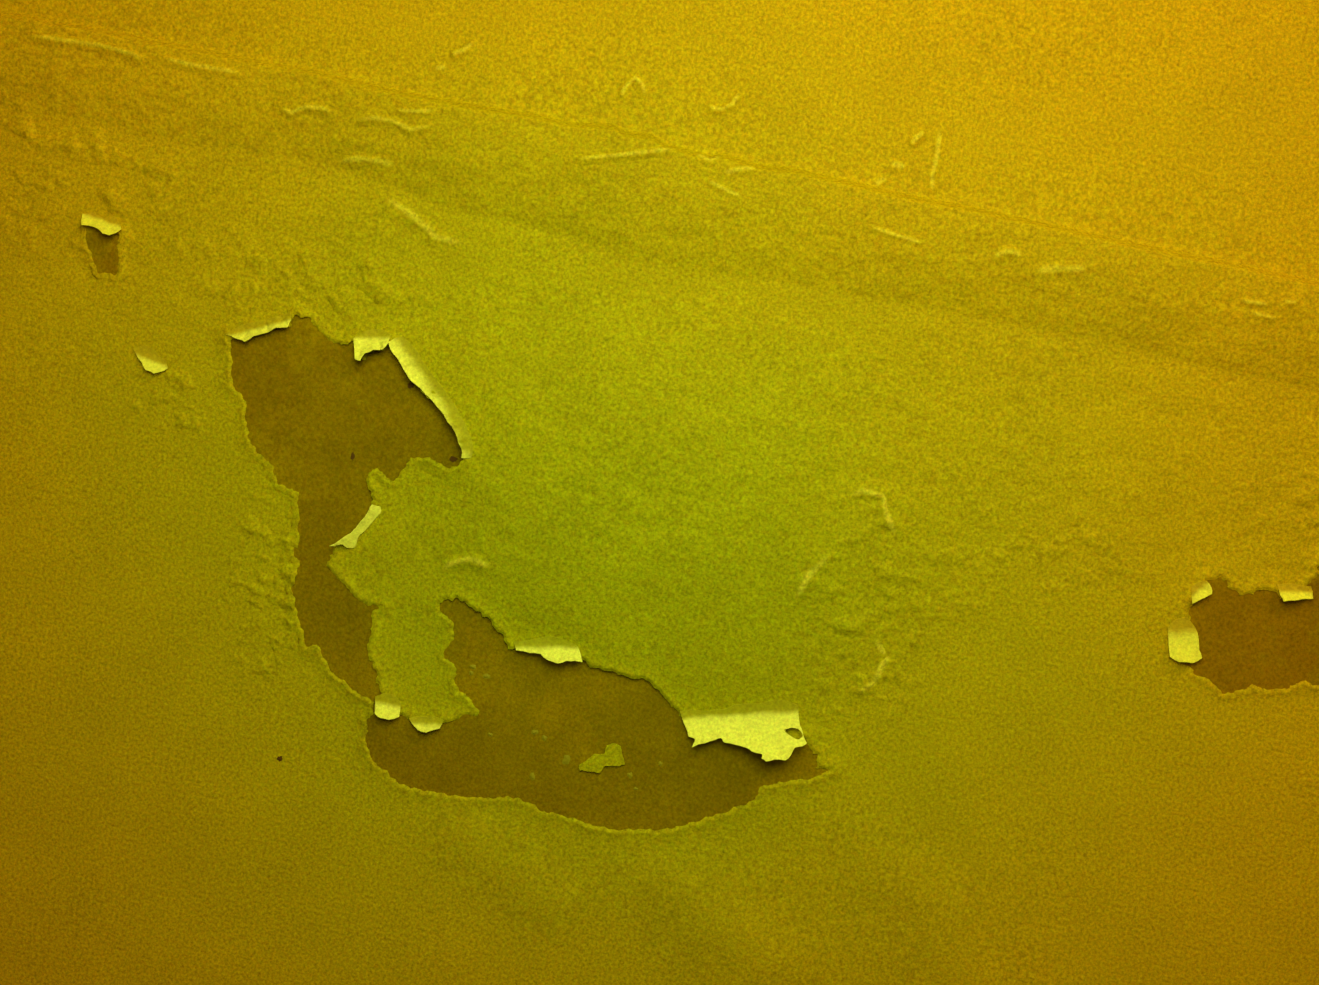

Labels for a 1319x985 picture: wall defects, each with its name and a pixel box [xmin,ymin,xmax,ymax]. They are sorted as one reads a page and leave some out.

peeling [71,212,135,293]
peeling [133,345,168,374]
peeling [204,288,860,852]
peeling [1156,543,1319,718]